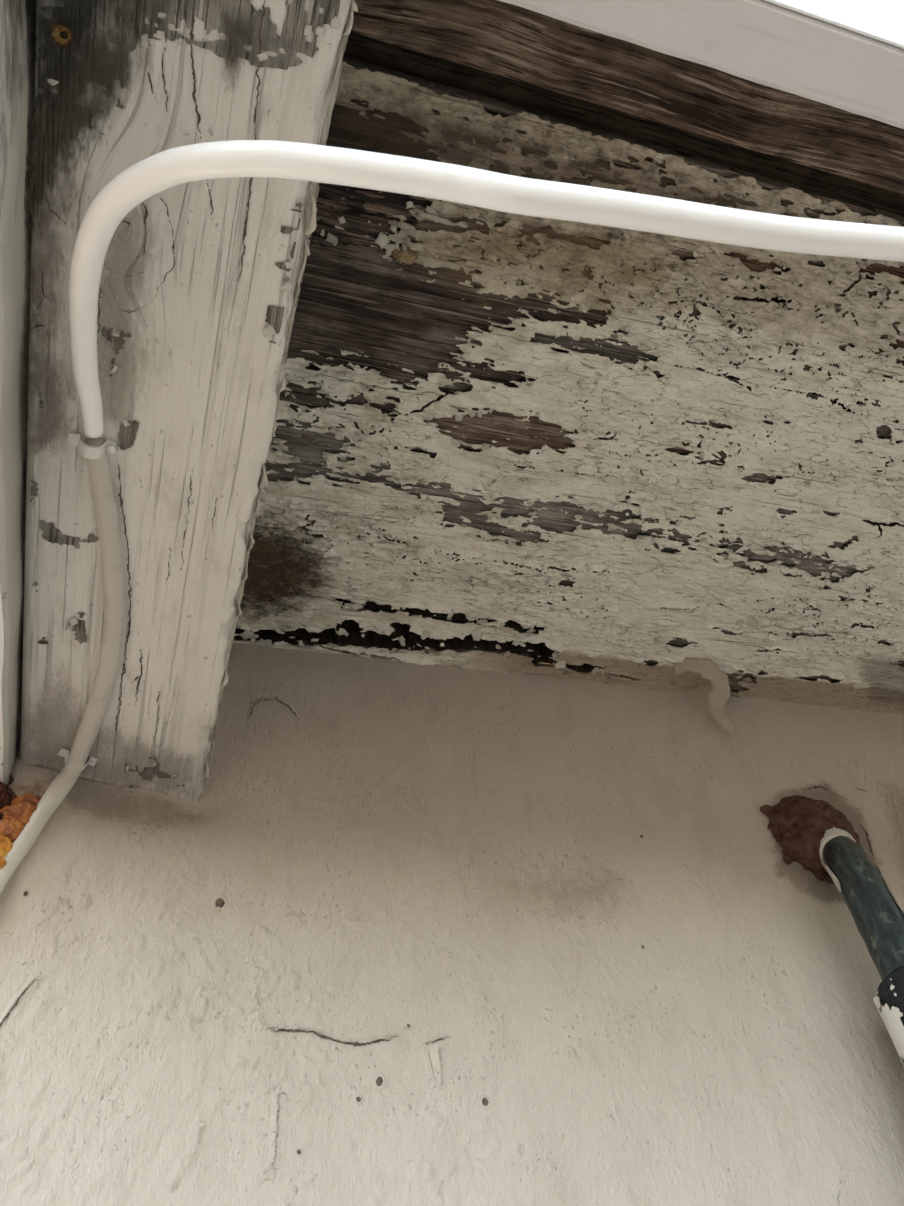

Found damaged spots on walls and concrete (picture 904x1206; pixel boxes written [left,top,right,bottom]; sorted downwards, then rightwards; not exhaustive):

water stain [224,19,250,73]
peeling [35,0,358,200]
peeling [326,99,765,213]
water stain [27,0,133,452]
peeling [850,259,904,306]
peeling [116,417,139,451]
peeling [259,183,879,604]
peeling [39,520,99,549]
water stain [240,516,331,619]
spalling [234,596,628,678]
crack [0,975,42,1026]
crack [267,1024,452,1046]